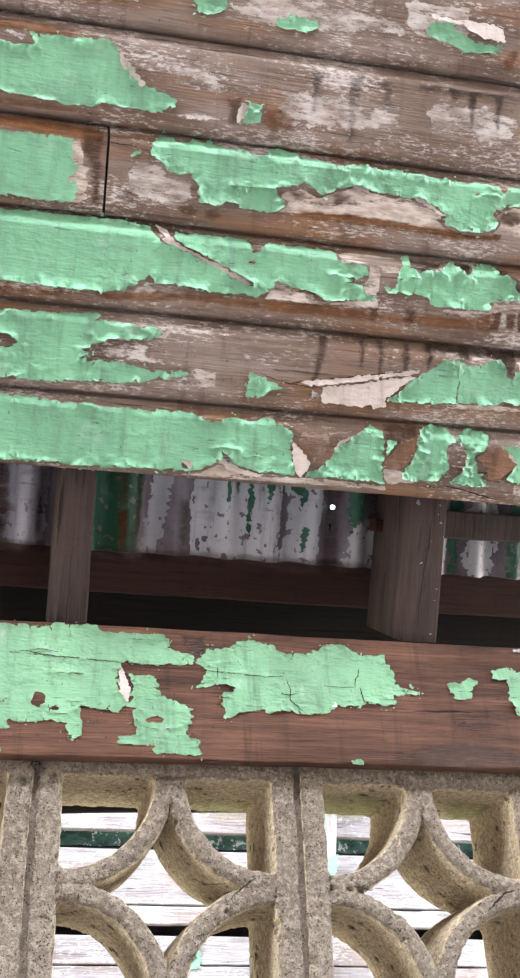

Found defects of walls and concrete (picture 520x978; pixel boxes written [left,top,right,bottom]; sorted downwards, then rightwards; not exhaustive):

peeling [192,0,506,57]
peeling [0,29,266,125]
leakage [422,86,513,129]
peeling [0,129,520,317]
peeling [0,308,216,390]
peeling [244,372,284,398]
peeling [301,350,520,412]
peeling [0,393,520,568]
peeling [441,538,520,579]
peeling [0,622,424,761]
peeling [447,678,478,700]
peeling [491,667,520,716]